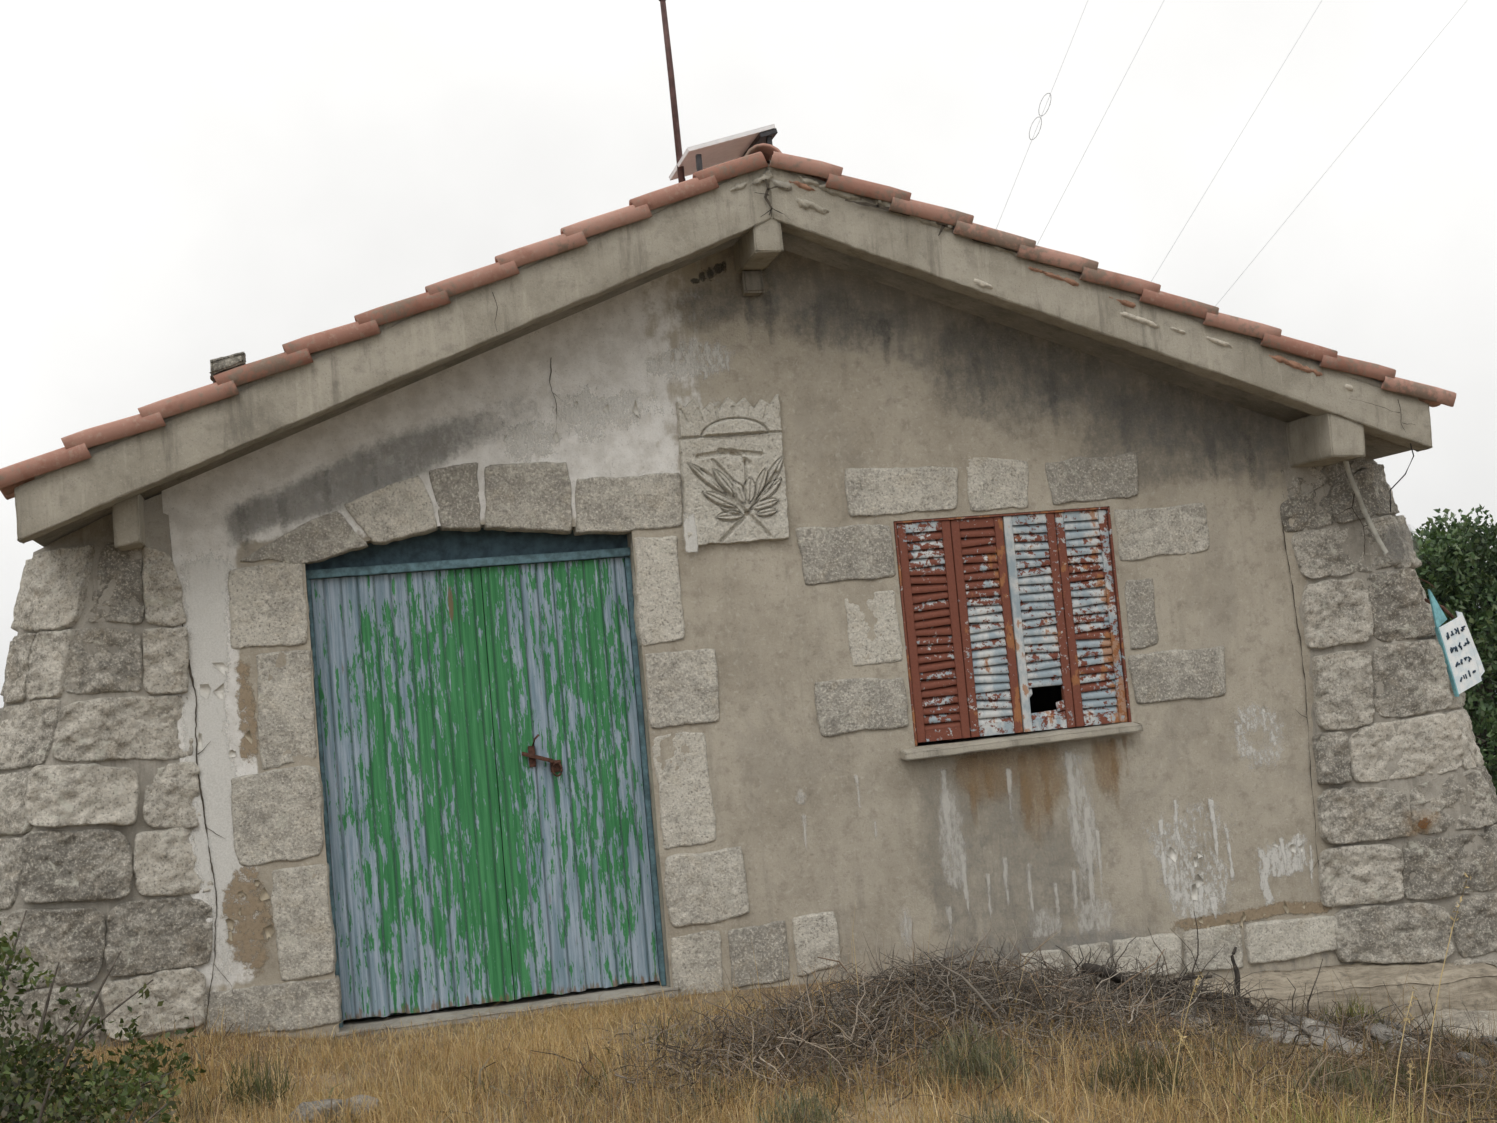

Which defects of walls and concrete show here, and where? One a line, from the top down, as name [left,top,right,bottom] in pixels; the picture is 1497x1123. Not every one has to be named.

crack [755,179,789,219]
peeling [181,553,274,978]
leakage [939,769,969,936]
leakage [986,858,1009,917]
leakage [1028,752,1112,938]